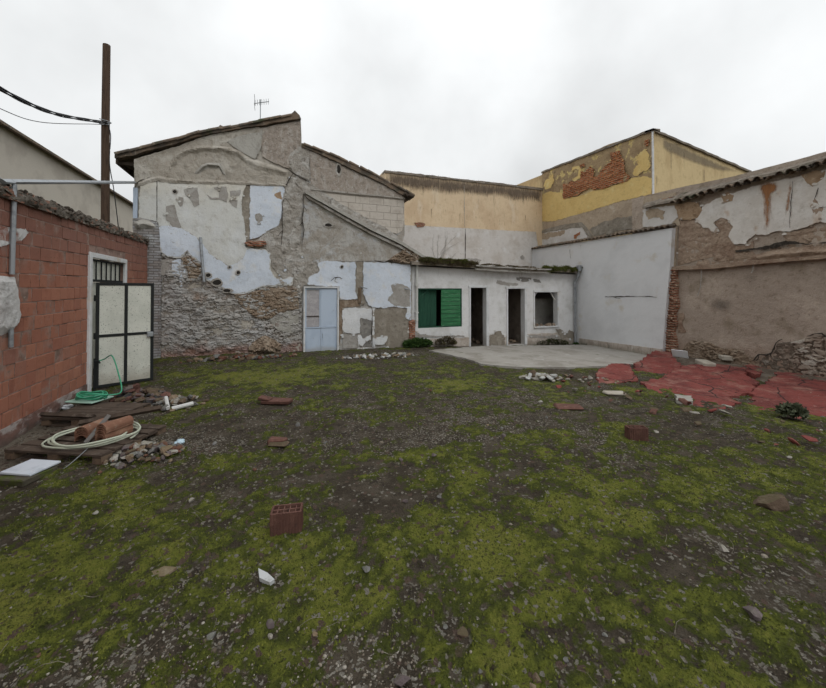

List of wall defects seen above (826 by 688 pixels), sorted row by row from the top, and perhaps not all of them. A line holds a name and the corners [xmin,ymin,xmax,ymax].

flaking render [542,131,655,199]
spalling [663,197,782,266]
rust [761,183,776,225]
spalling [770,199,826,251]
spalling [800,170,825,187]
spalling [161,176,319,358]
spalling [356,262,366,306]
spalling [340,284,416,349]
spalling [682,334,826,378]